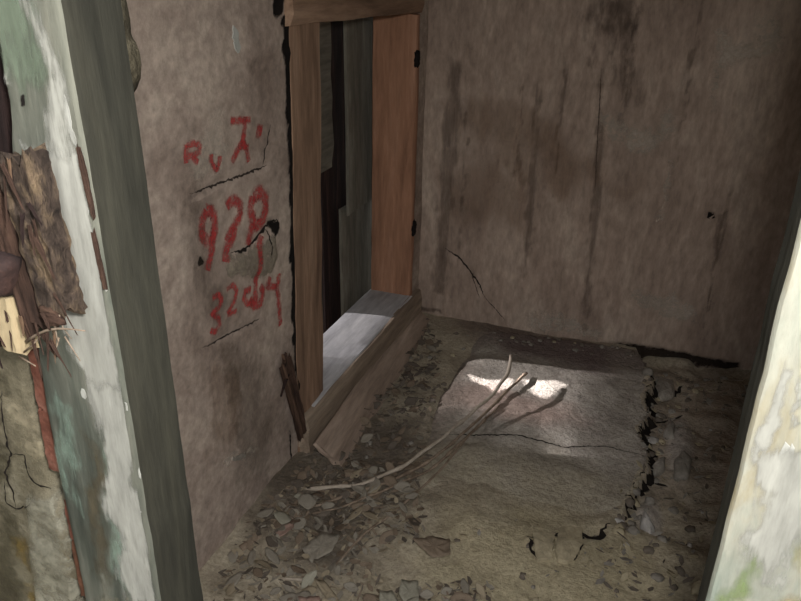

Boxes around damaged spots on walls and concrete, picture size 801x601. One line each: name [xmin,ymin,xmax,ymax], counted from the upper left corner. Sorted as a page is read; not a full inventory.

peeling [23,1,155,601]
spalling [227,221,280,278]
spalling [273,0,300,389]
crack [445,248,505,320]
crack [0,394,51,510]
crack [441,375,683,560]
peeling [742,370,801,587]